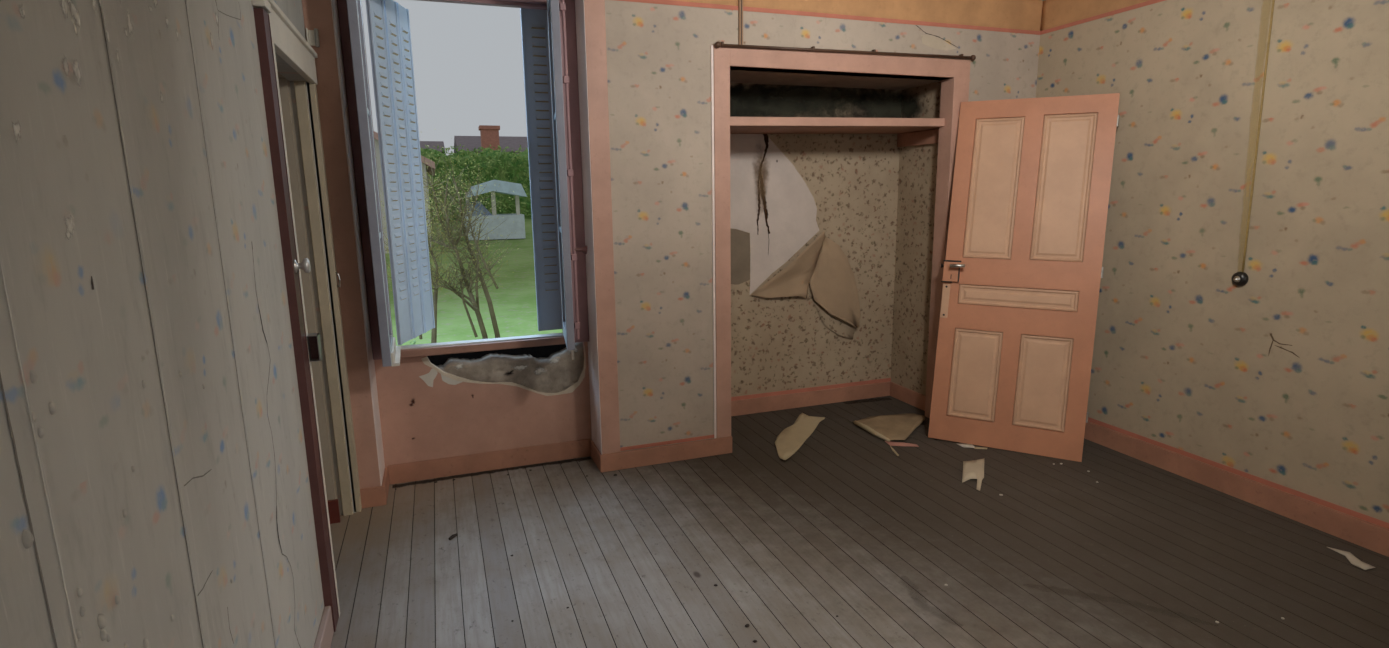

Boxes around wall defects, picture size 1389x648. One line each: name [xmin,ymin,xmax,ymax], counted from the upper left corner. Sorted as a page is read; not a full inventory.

peeling [730,134,819,294]
flaking render [419,342,586,398]